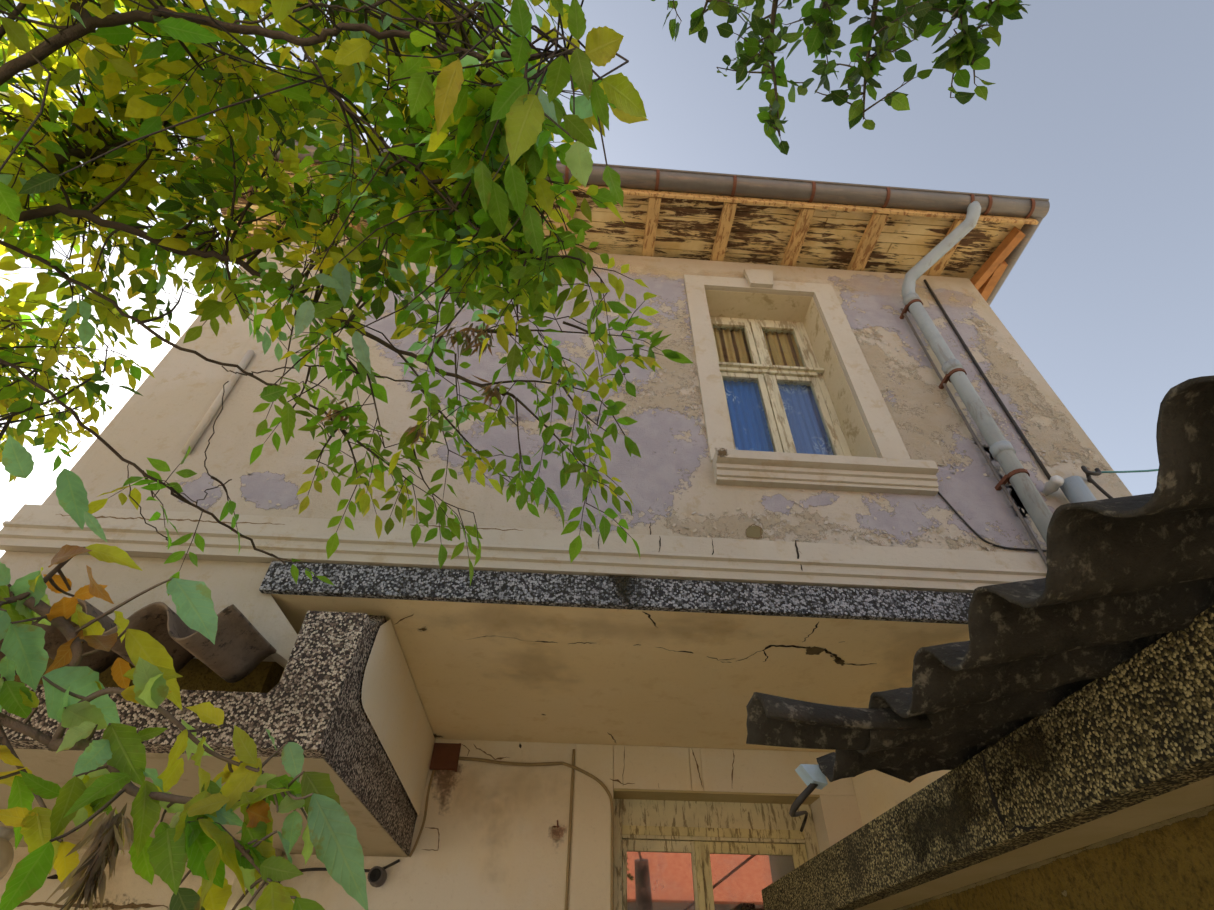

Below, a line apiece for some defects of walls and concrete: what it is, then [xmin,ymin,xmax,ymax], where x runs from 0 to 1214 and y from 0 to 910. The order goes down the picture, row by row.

peeling [361,264,1122,554]
peeling [176,472,223,511]
peeling [240,471,300,510]
crack [633,612,877,666]
crack [17,874,169,910]